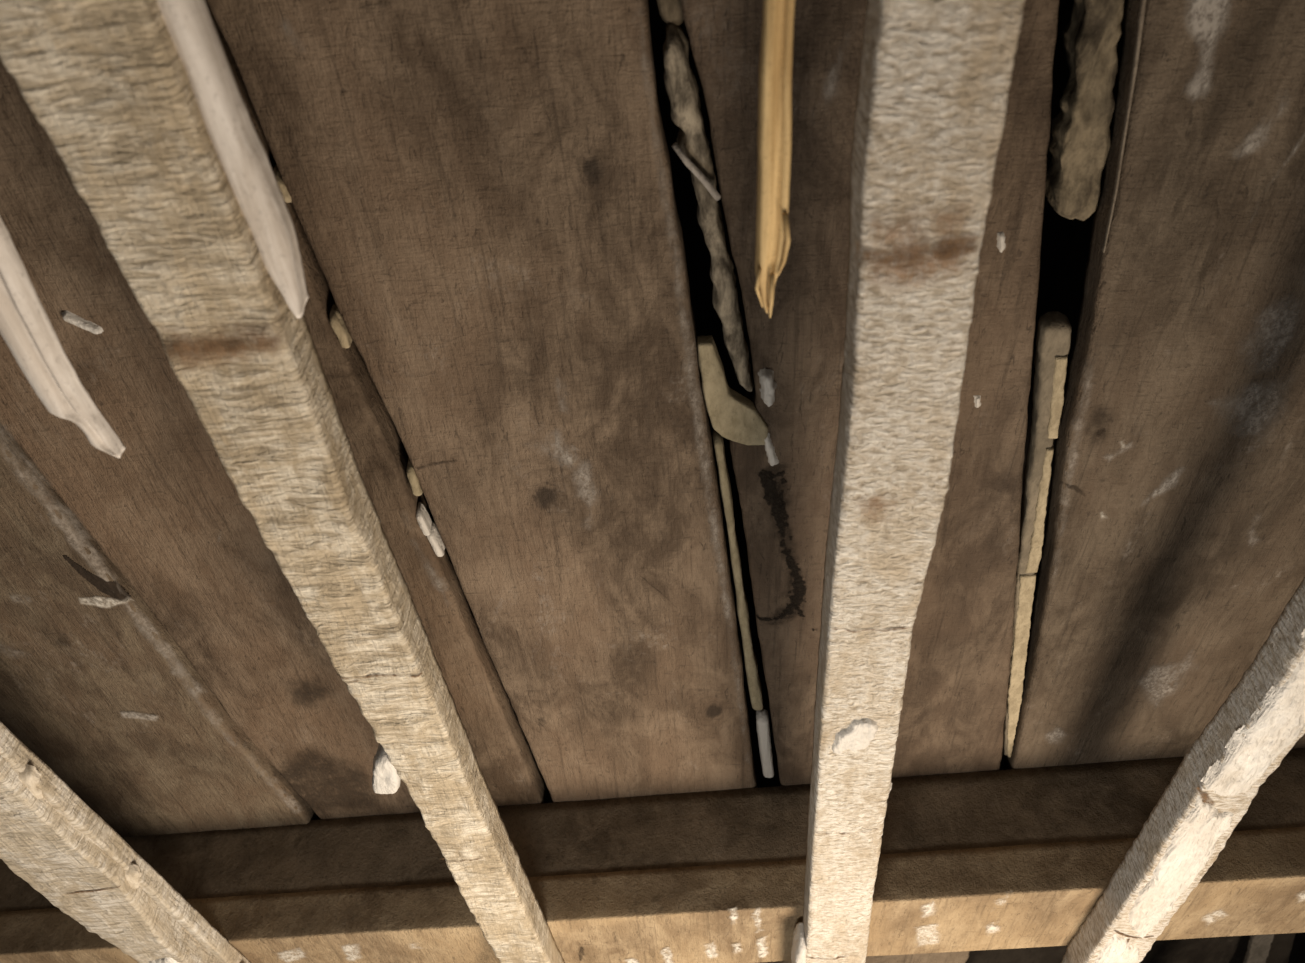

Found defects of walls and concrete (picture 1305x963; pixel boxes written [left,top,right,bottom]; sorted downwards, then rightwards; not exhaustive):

rust [862,237,975,277]
flaking render [1094,629,1305,963]